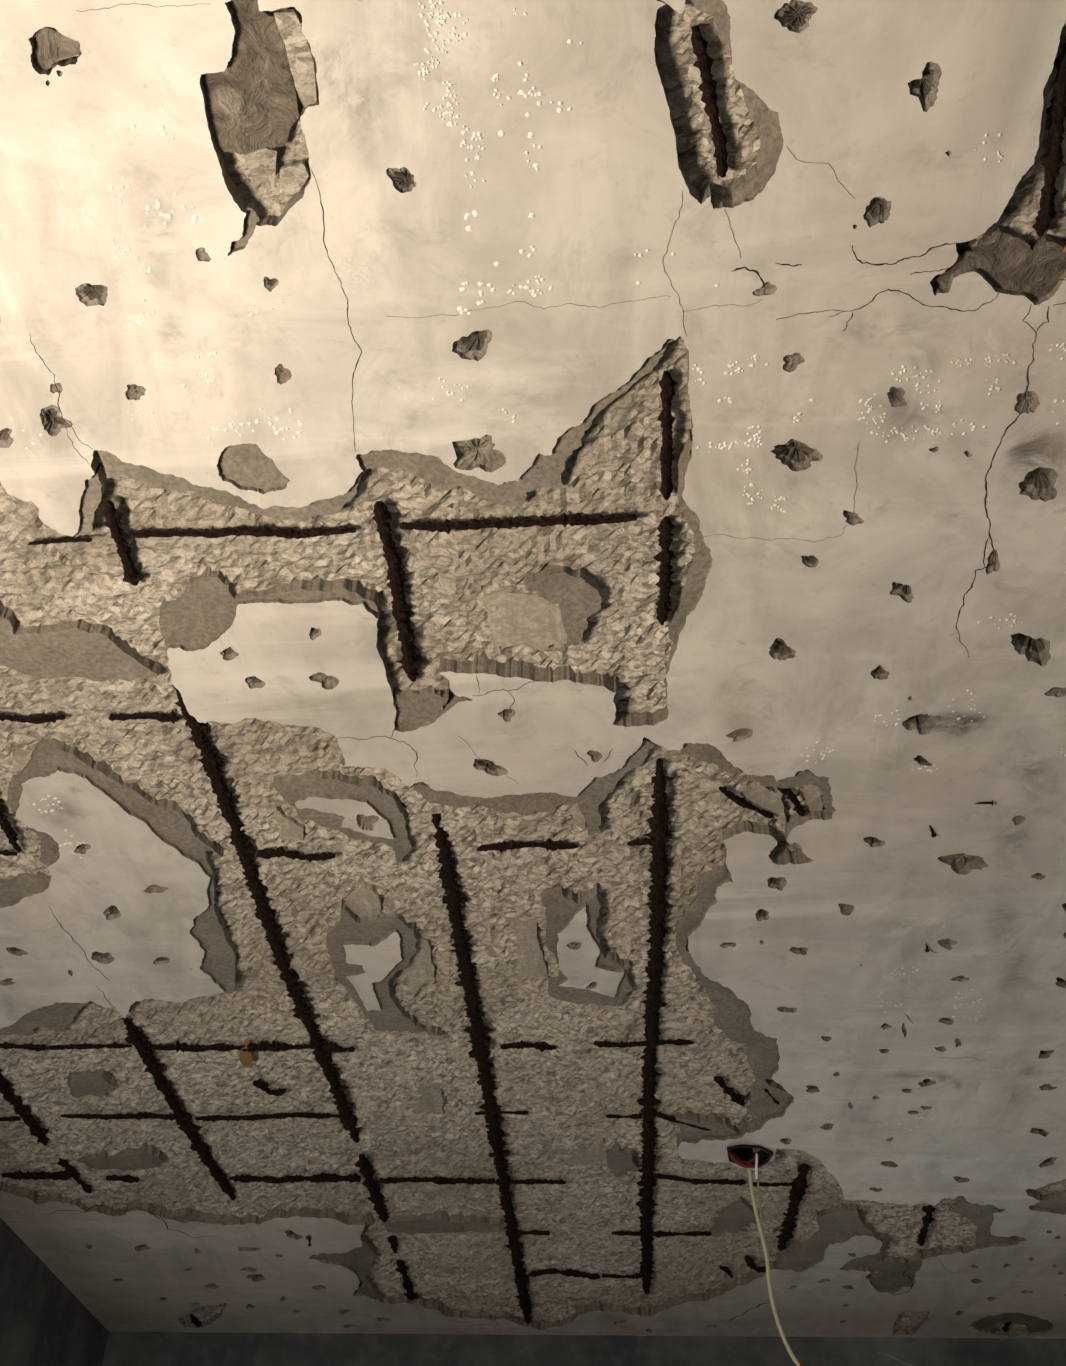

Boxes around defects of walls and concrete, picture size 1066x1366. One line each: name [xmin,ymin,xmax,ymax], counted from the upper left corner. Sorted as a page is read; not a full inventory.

spalling [200,0,319,256]
crack [311,170,362,447]
crack [388,198,999,333]
spalling [654,0,783,209]
crack [789,150,854,198]
spalling [930,22,1066,305]
corrosion [102,500,356,586]
corrosion [372,500,637,681]
corrosion [653,370,678,625]
crack [956,279,1066,658]
spalling [0,336,1059,1336]
corrosion [0,685,811,1324]